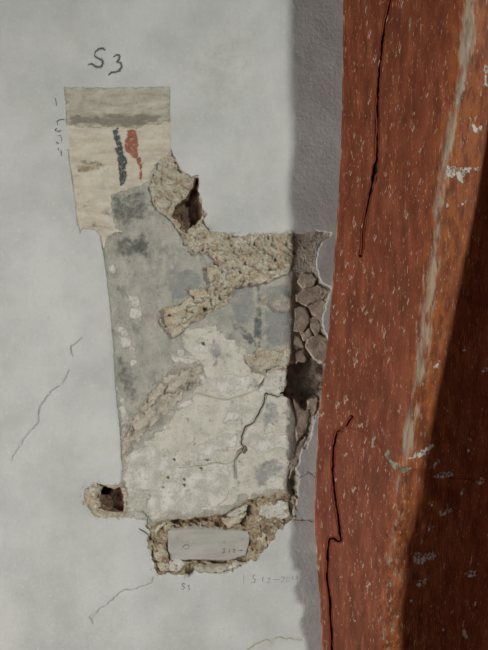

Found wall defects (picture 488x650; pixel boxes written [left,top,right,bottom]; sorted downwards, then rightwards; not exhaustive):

crack [347,0,393,255]
crack [11,337,82,461]
flaking render [64,86,346,575]
crack [178,365,284,478]
crack [297,416,383,650]